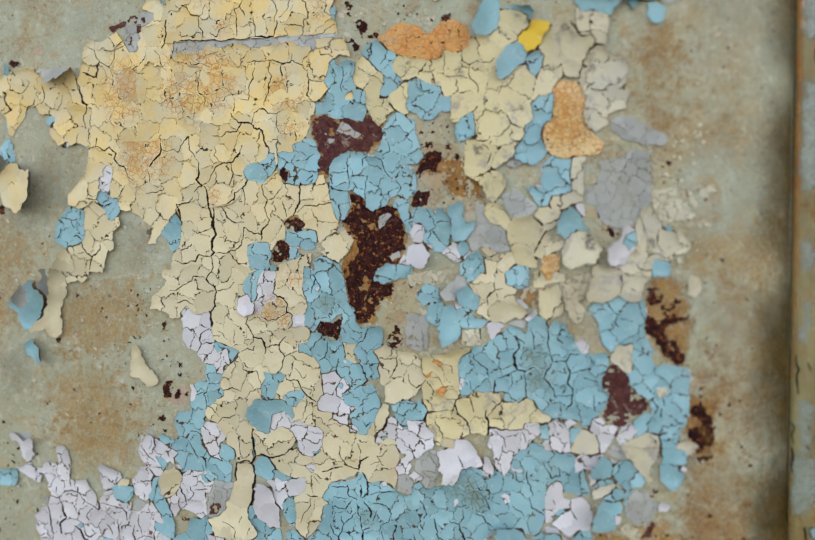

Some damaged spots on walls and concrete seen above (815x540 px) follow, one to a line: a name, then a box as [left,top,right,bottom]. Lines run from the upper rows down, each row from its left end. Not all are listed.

peeling [647,0,678,24]
corrosion [311,115,384,178]
crack [3,0,401,427]
peeling [0,0,629,540]
corrosion [341,193,408,348]
crack [215,429,297,540]
crack [302,445,578,540]
crack [383,323,608,453]
corrosion [602,364,648,427]
peeling [621,524,642,540]
corrosion [685,387,722,465]
peeling [790,401,815,515]